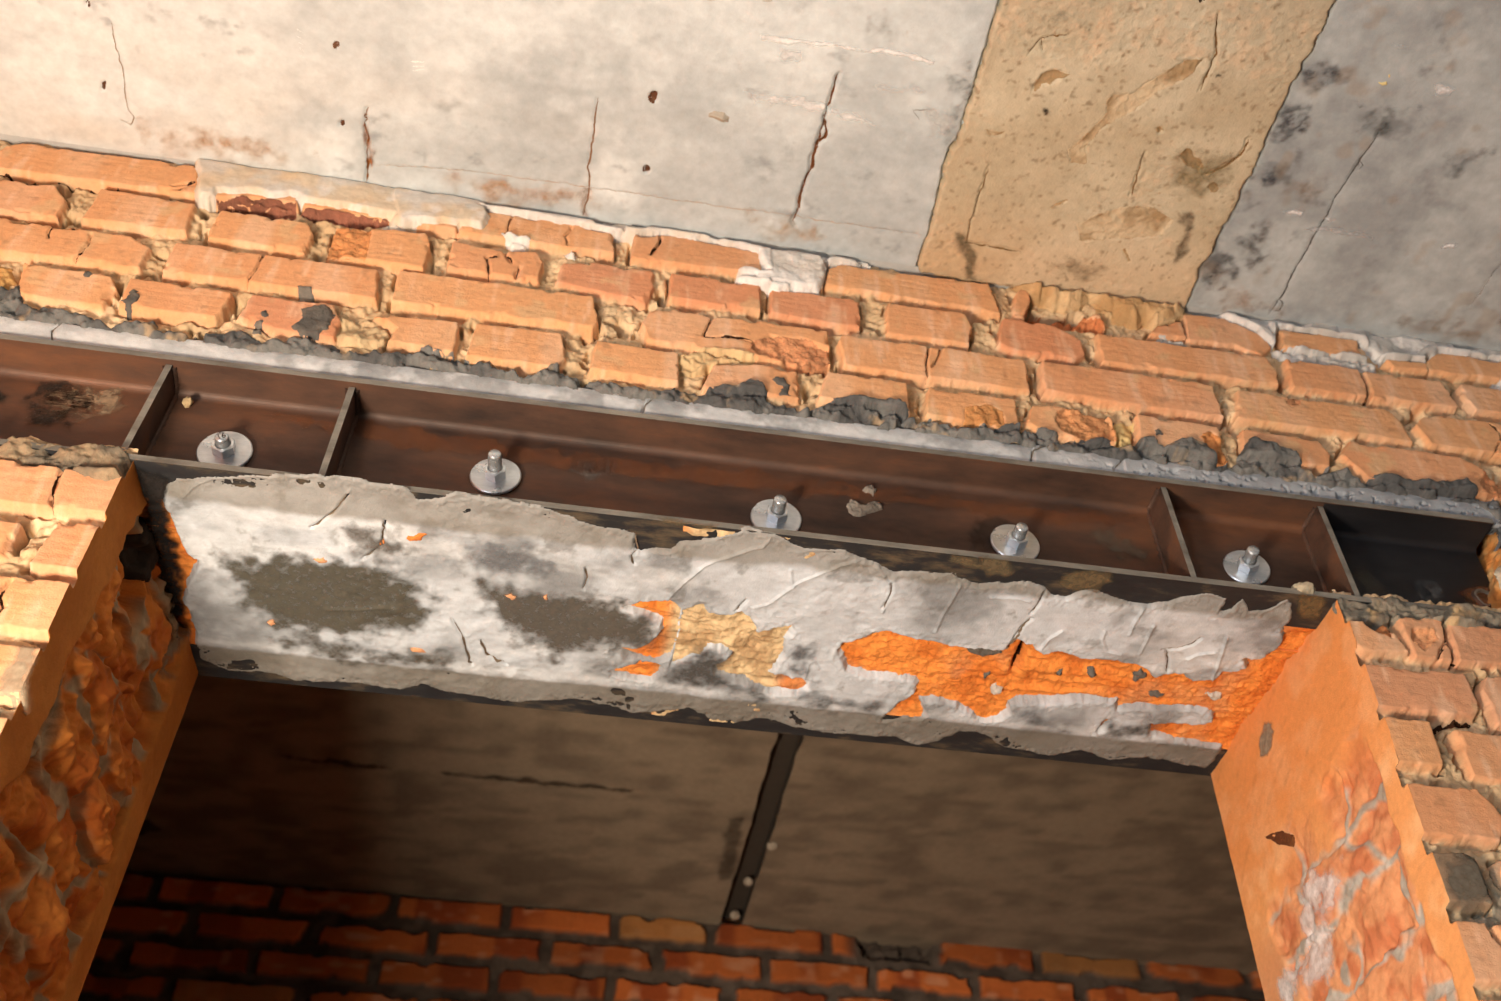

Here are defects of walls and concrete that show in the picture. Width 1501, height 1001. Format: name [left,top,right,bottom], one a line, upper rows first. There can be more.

crack [111,22,134,125]
crack [364,73,908,244]
crack [487,218,519,283]
crack [1270,133,1378,312]
crack [52,473,63,514]
crack [0,587,8,613]
damp [226,528,448,666]
damp [477,544,653,664]
spalling [1265,831,1295,847]